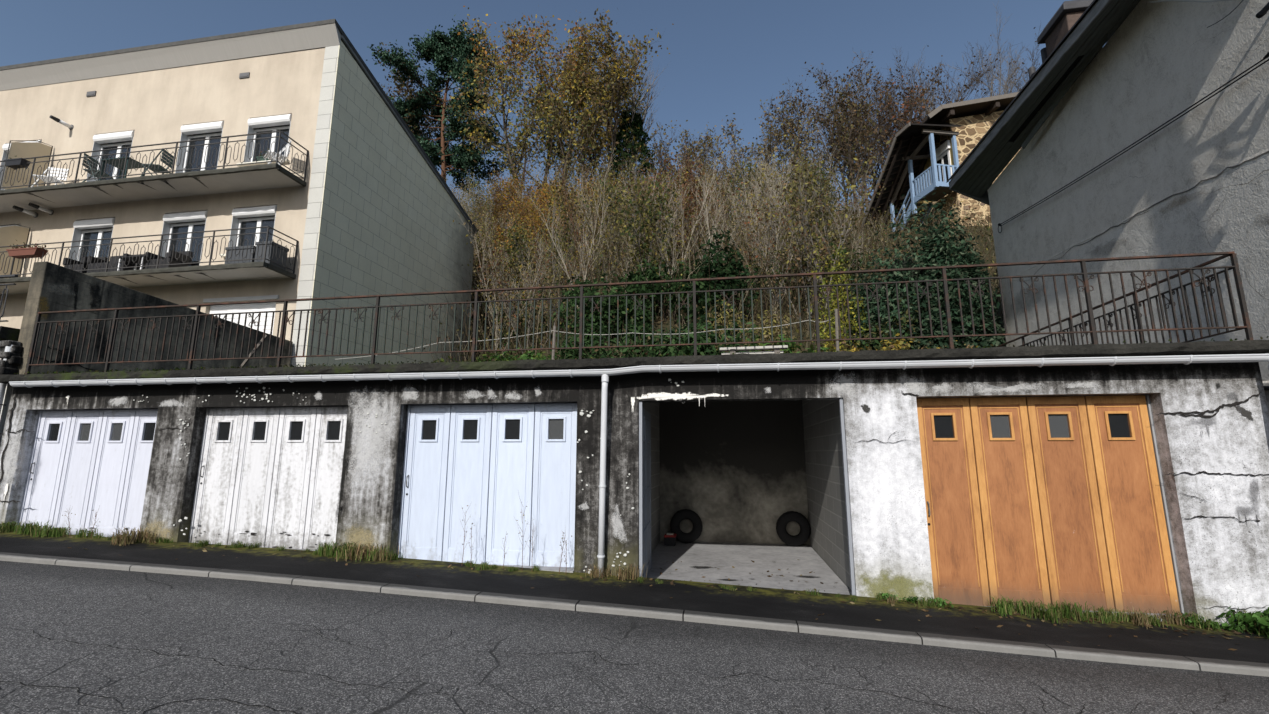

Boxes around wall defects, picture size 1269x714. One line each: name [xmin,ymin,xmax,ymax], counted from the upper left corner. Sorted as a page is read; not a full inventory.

crack [1012,151,1269,300]
peeling [631,392,728,409]
crack [1158,392,1261,418]
water stain [336,388,417,518]
crack [1165,471,1269,522]